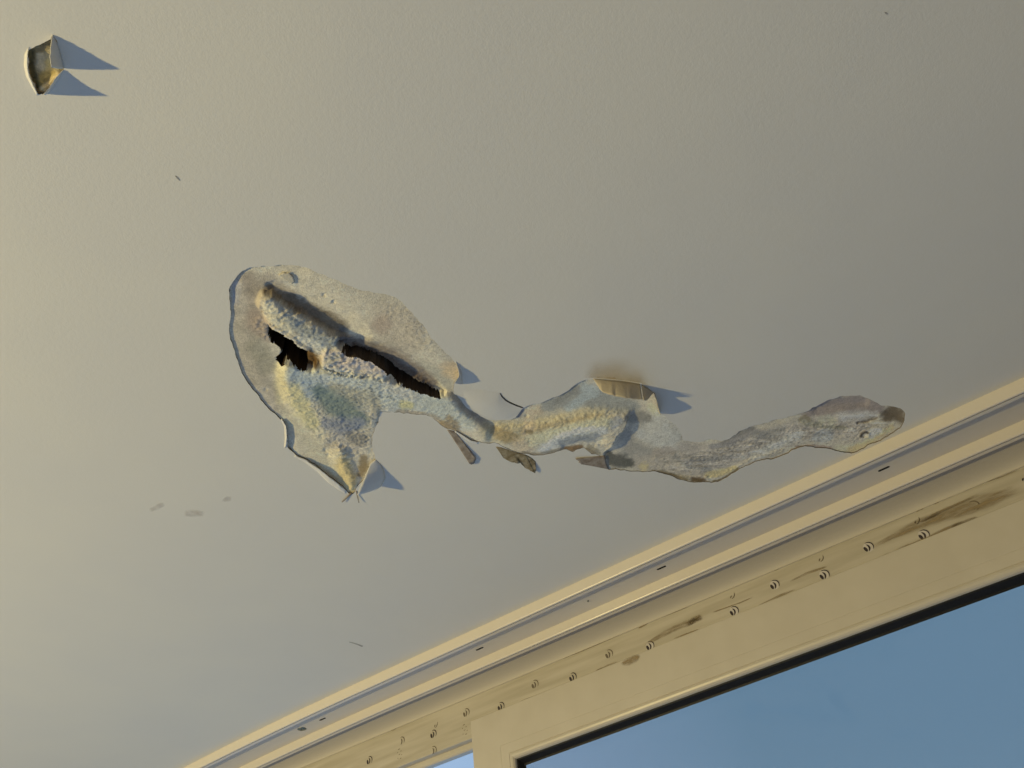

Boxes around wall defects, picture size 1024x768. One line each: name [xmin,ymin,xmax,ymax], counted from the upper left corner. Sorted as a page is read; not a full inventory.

peeling [24,35,64,95]
flaking render [229,265,902,503]